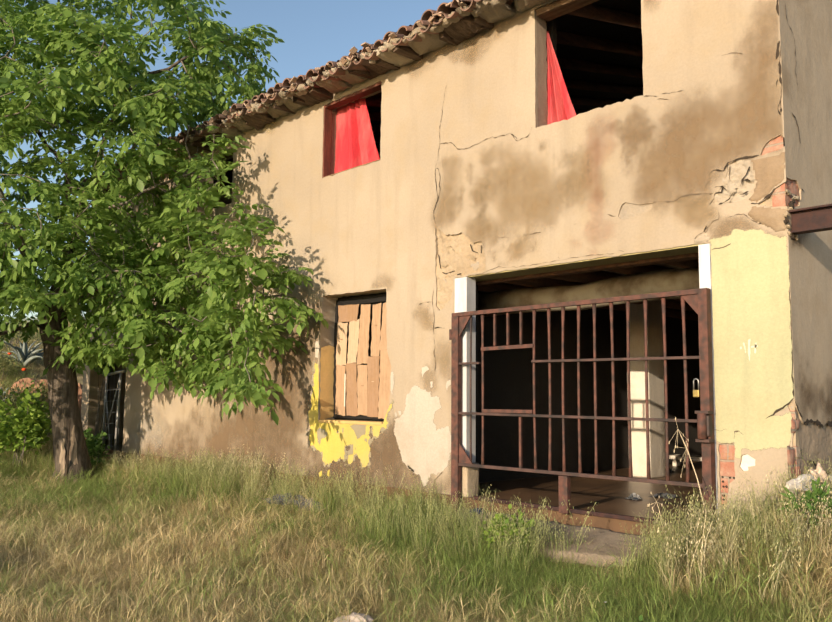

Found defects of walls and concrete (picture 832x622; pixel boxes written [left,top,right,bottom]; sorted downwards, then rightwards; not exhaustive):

crack [776,0,800,139]
flaking render [436,227,486,310]
crack [433,93,530,221]
leakage [642,28,780,220]
crack [653,155,775,250]
leakage [718,221,748,235]
flaking render [712,159,755,205]
flaking render [759,179,800,240]
peeling [308,341,451,486]
flaking render [719,443,755,509]
crack [767,275,832,474]
flaking render [787,402,832,480]